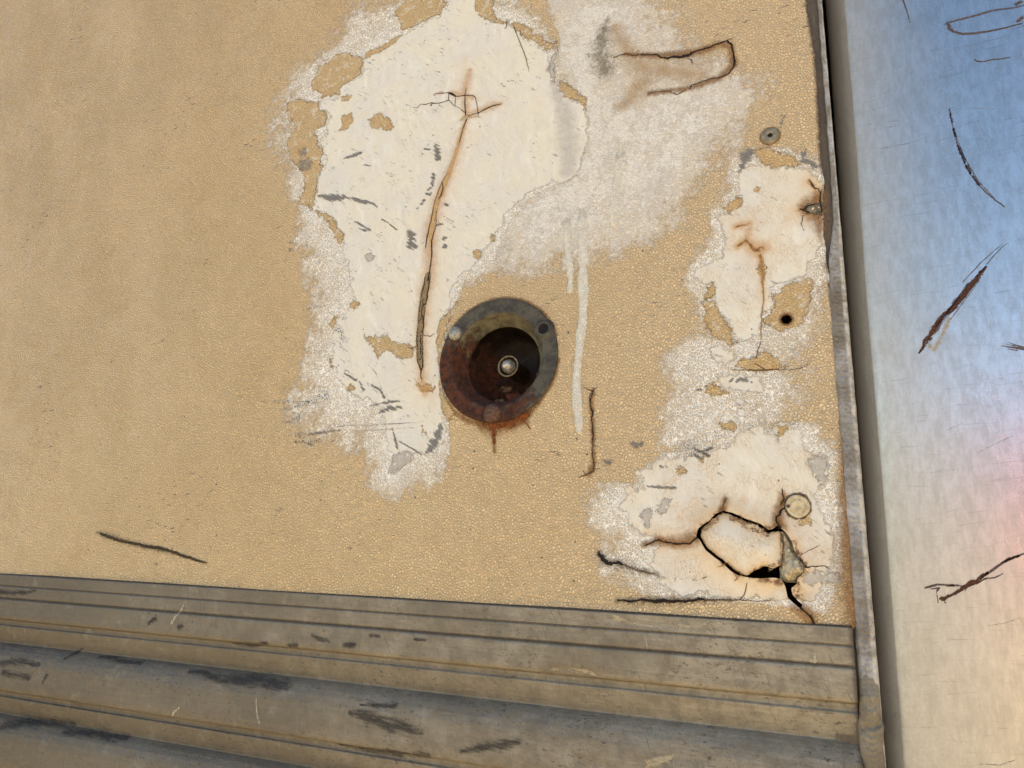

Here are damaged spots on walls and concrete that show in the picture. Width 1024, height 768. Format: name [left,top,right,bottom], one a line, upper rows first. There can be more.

crack [616,39,736,95]
crack [408,87,499,380]
peeling [267,0,845,614]
crack [732,225,808,371]
rust [447,358,560,453]
crack [578,387,600,478]
crack [719,497,728,511]
crack [773,488,829,569]
crack [597,536,816,624]